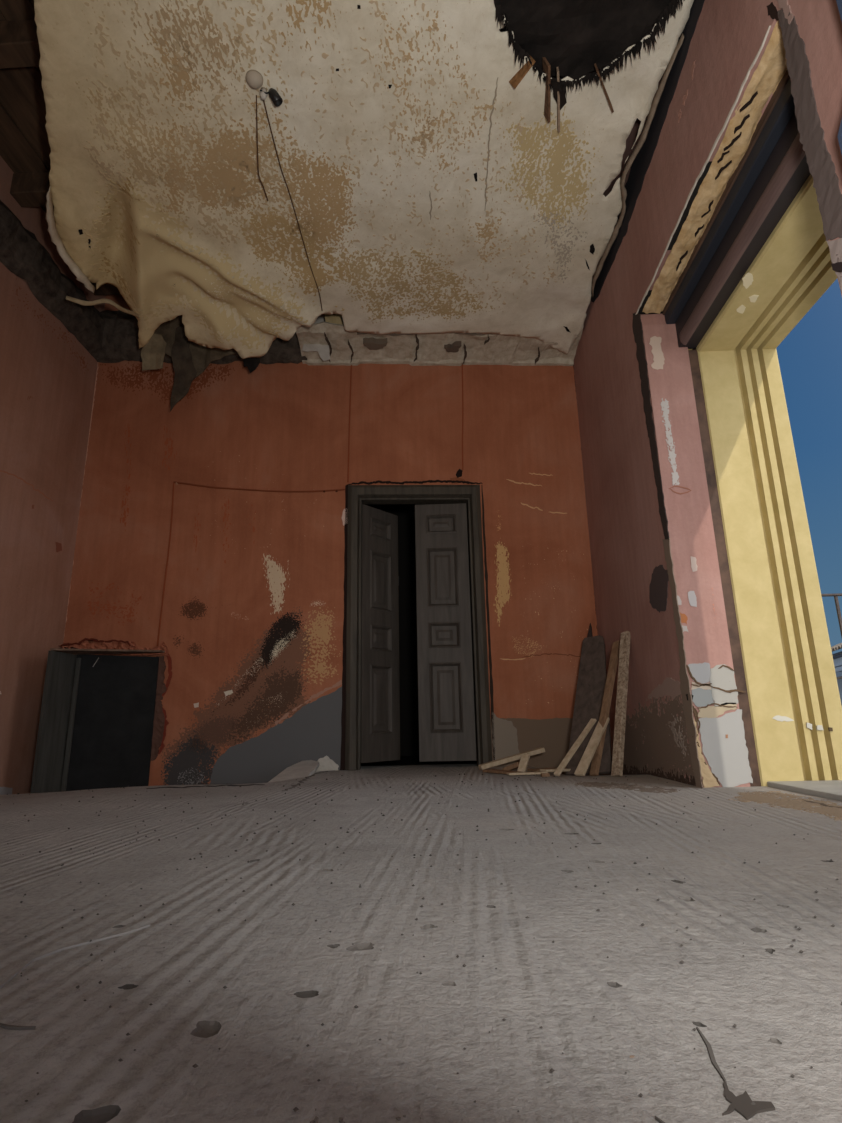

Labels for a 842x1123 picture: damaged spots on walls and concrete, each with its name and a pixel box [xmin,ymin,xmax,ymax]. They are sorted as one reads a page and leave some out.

damp [74,0,603,354]
flaking render [767,2,842,292]
damp [11,277,246,406]
crack [324,332,419,363]
crack [452,332,499,364]
peeling [263,554,290,614]
peeling [493,512,512,626]
flaking render [632,313,753,788]
damp [216,630,295,704]
flaking render [316,756,339,772]